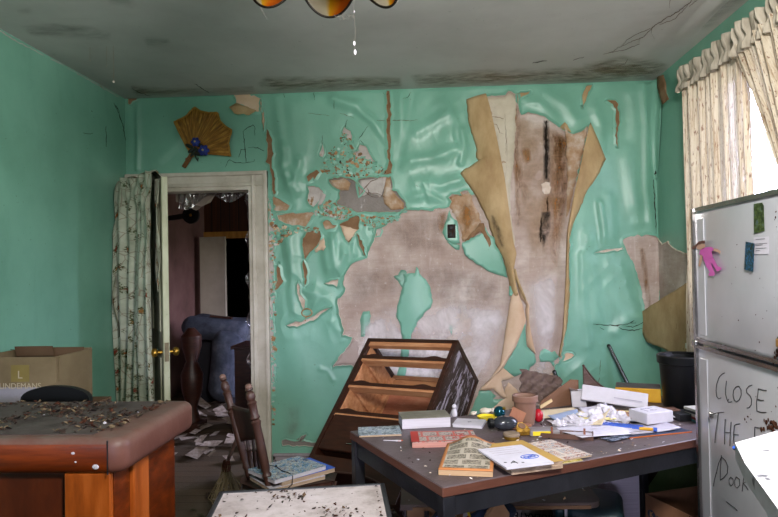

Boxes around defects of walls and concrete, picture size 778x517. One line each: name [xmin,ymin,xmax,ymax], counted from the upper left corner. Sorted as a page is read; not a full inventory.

crack [609,0,696,66]
peeling [657,75,669,105]
peeling [229,88,606,425]
peeling [600,232,687,351]